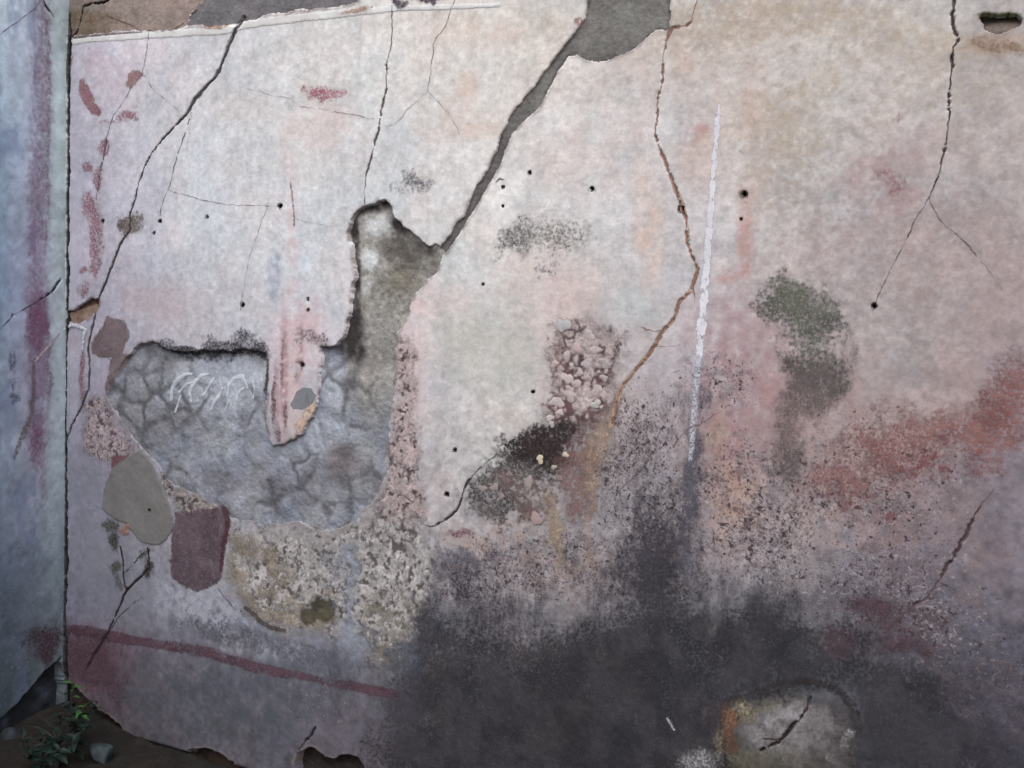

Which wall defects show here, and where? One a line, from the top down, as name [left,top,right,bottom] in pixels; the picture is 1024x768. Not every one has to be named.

crack [335,0,455,204]
crack [611,2,699,424]
crack [897,0,976,257]
flaking render [980,16,1021,35]
flaking render [101,519,130,587]
crack [2,0,267,685]
flaking render [107,201,445,632]
crack [427,457,493,527]
water stain [160,103,1024,768]
crack [882,501,984,633]